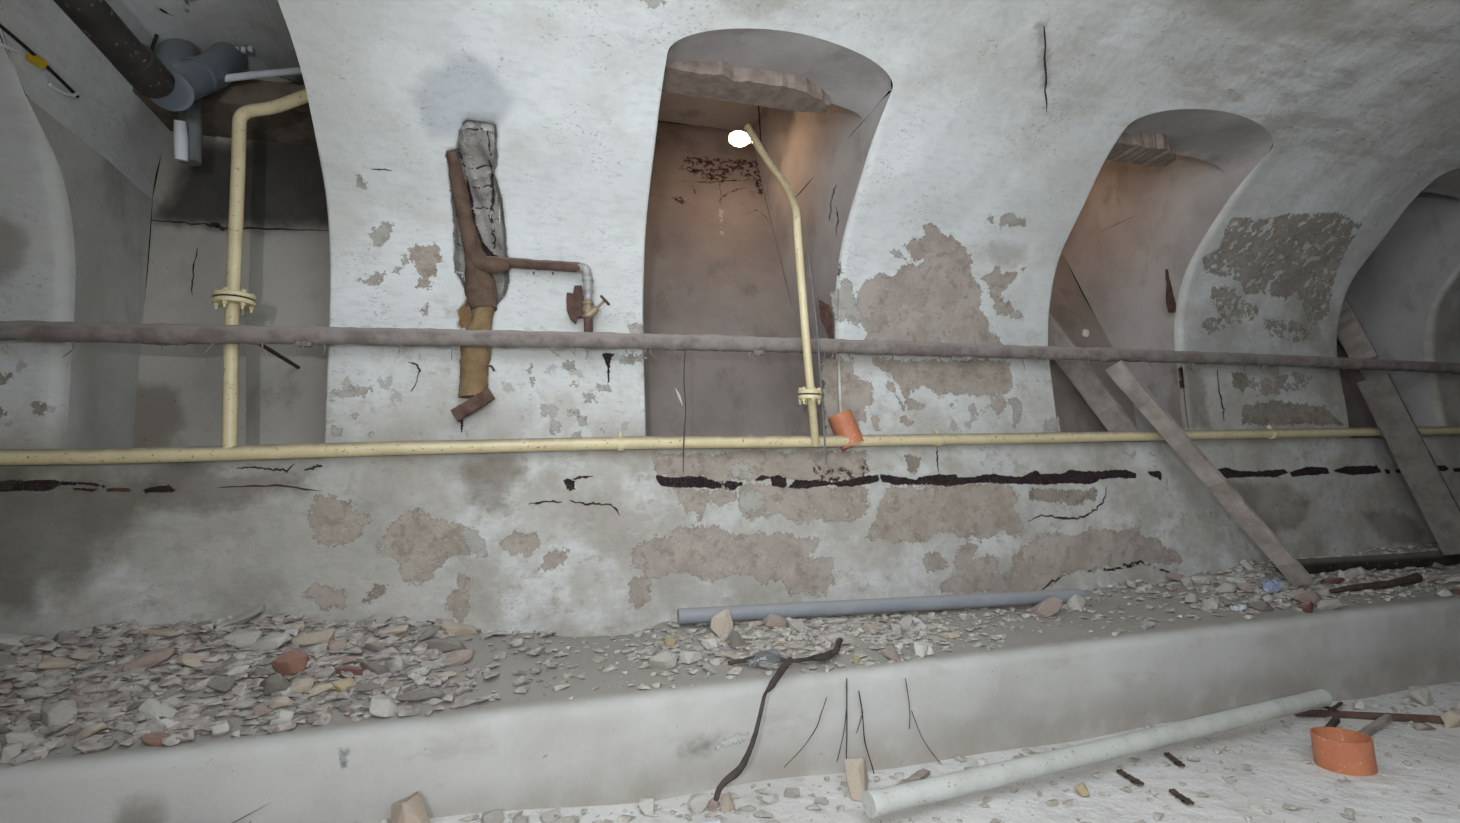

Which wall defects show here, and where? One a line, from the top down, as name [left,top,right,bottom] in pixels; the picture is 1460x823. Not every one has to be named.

peeling [679,156,762,195]
spalling [356,120,510,316]
peeling [984,213,1026,229]
peeling [1202,212,1361,342]
corrosion [457,300,472,328]
peeling [627,222,1188,609]
crack [0,479,175,493]
crack [529,476,620,516]
crack [656,450,1162,522]
crack [1218,465,1401,479]
crack [1437,464,1460,472]
peeling [303,493,570,623]